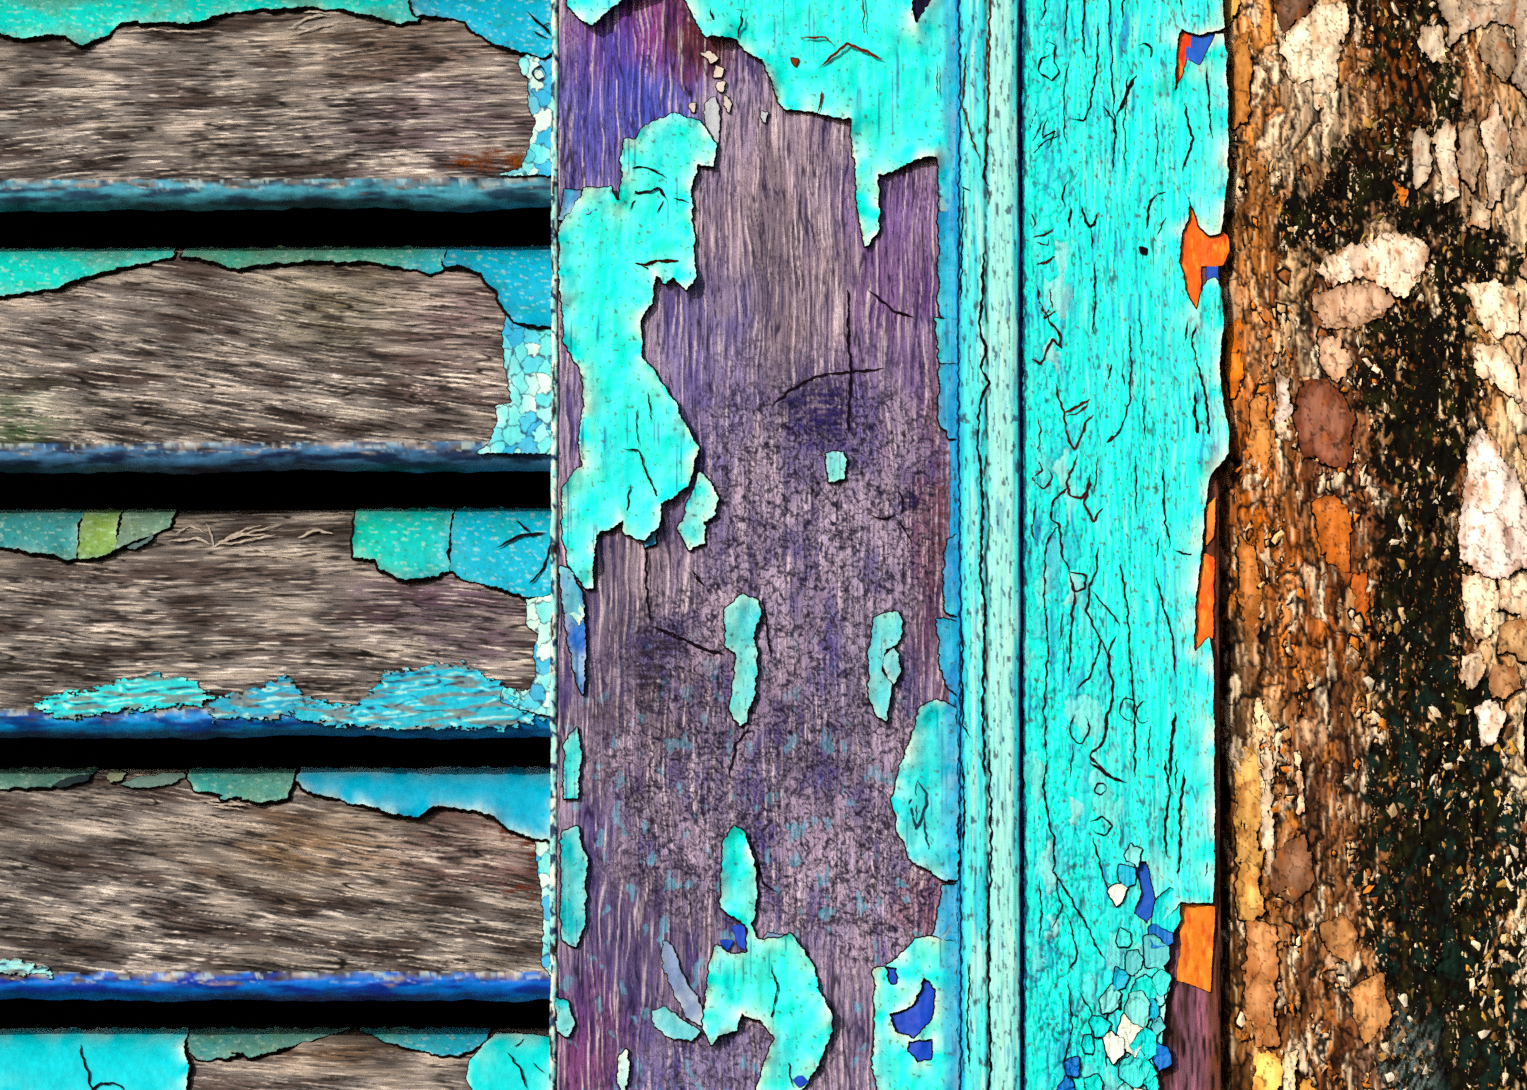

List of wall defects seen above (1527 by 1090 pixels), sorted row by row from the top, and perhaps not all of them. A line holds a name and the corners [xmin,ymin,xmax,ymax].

crack [800,0,882,113]
peeling [0,0,957,733]
crack [772,290,914,432]
crack [908,0,1213,1090]
peeling [0,957,53,980]
peeling [0,996,577,1090]
peeling [0,726,590,976]
peeling [615,1048,631,1090]
peeling [651,824,835,1090]
peeling [870,534,961,1090]
peeling [1055,887,1182,1090]
peeling [1106,842,1143,907]